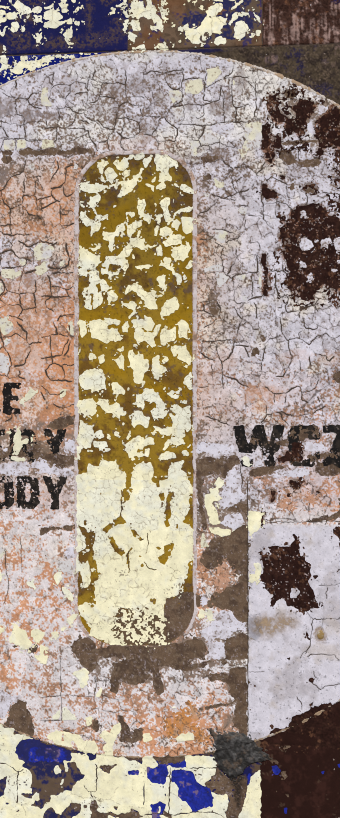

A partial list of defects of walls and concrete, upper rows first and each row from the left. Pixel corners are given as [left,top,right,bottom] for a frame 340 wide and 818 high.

peeling [0,0,97,84]
peeling [108,0,264,53]
crack [0,65,340,424]
peeling [0,146,340,748]
peeling [0,694,262,818]
peeling [256,699,340,780]